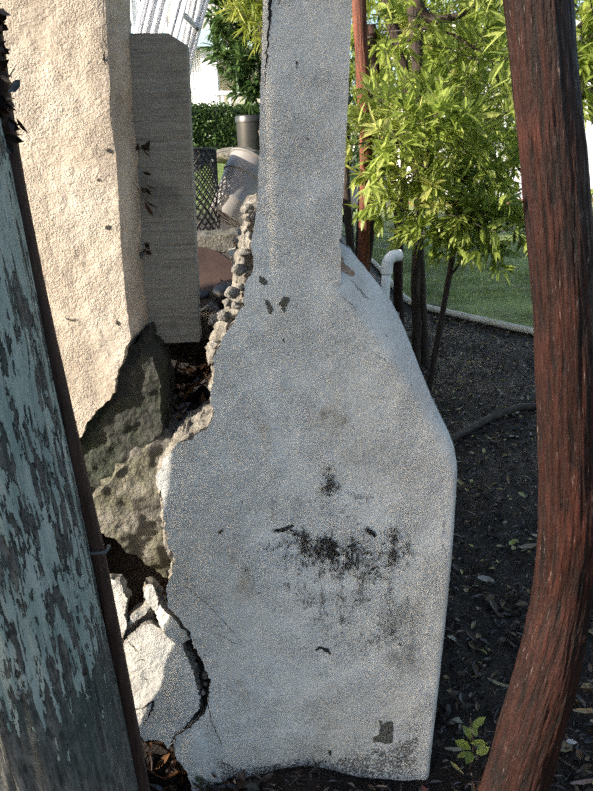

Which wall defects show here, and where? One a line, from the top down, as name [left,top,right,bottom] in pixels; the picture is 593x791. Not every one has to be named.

crack [264,0,280,86]
spalling [191,193,267,429]
peeling [263,297,290,314]
spalling [157,431,181,471]
spalling [110,573,132,638]
crack [154,586,168,621]
spalling [158,489,173,579]
spalling [143,576,191,644]
leakage [265,466,414,661]
crack [130,644,154,726]
crack [171,639,223,747]